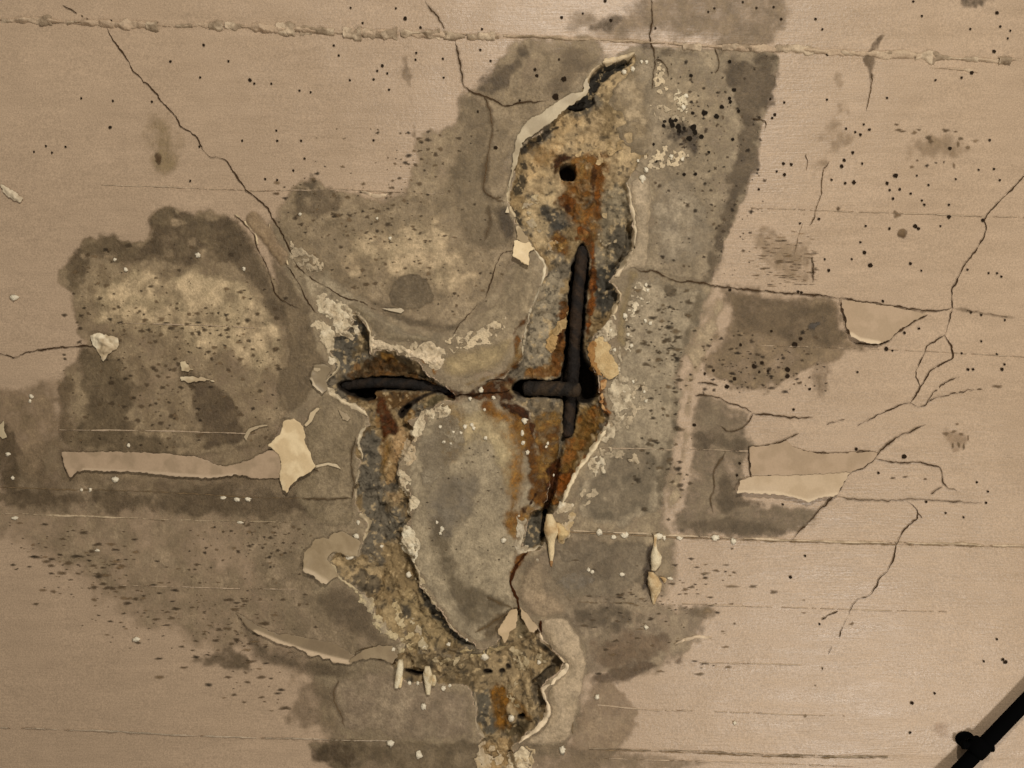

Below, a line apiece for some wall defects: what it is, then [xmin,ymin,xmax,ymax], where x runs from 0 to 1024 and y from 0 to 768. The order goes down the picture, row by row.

peeling [61,408,340,493]
crack [63,5,376,312]
spalling [237,313,569,768]
corrosion [347,301,611,538]
crack [425,1,539,201]
water stain [546,311,569,353]
spalling [502,52,648,554]
corrosion [552,154,608,334]
water stain [676,396,816,537]
crack [637,155,1024,670]
peeling [841,300,925,344]
water stain [303,646,569,768]